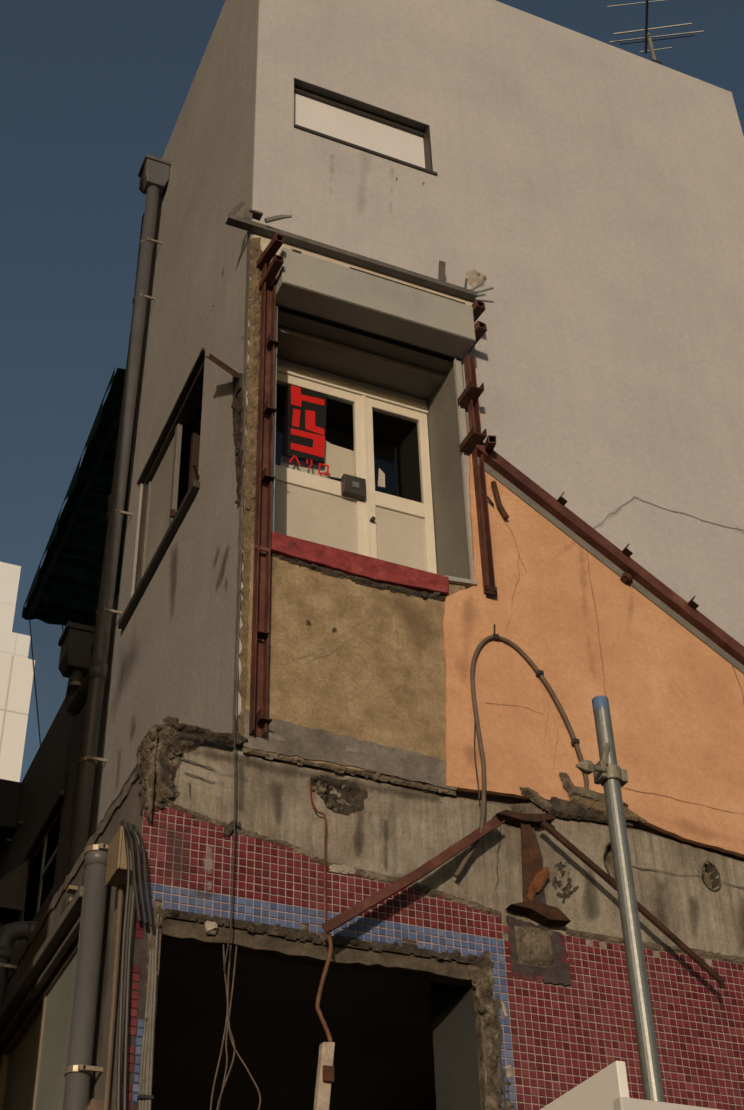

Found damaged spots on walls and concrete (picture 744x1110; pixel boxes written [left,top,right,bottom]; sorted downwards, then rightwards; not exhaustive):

flaking render [231,248,263,543]
crack [586,496,744,695]
spalling [136,716,502,917]
flaking render [510,772,608,824]
flaking render [623,802,647,826]
crack [622,787,741,814]